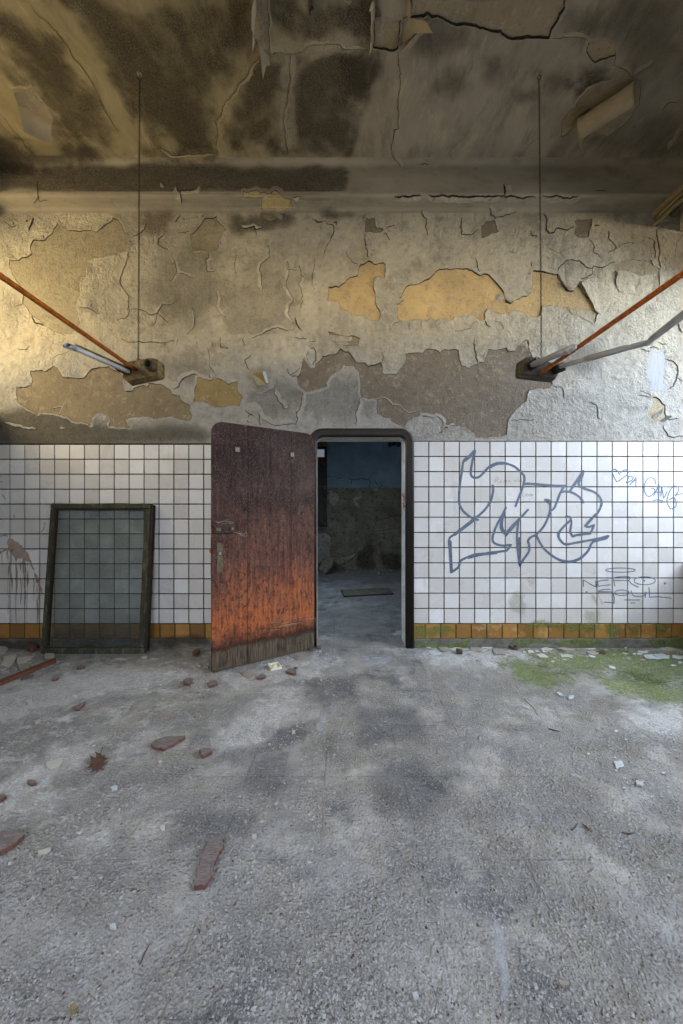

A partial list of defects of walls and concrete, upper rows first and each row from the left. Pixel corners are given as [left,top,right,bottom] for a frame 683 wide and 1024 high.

peeling [251,0,273,77]
damp [0,0,380,191]
peeling [559,74,643,152]
peeling [361,214,389,237]
crack [394,184,665,279]
peeling [570,214,597,242]
peeling [6,212,135,337]
peeling [294,254,664,440]
peeling [13,363,248,431]
peeling [644,392,672,425]
damp [0,539,42,621]